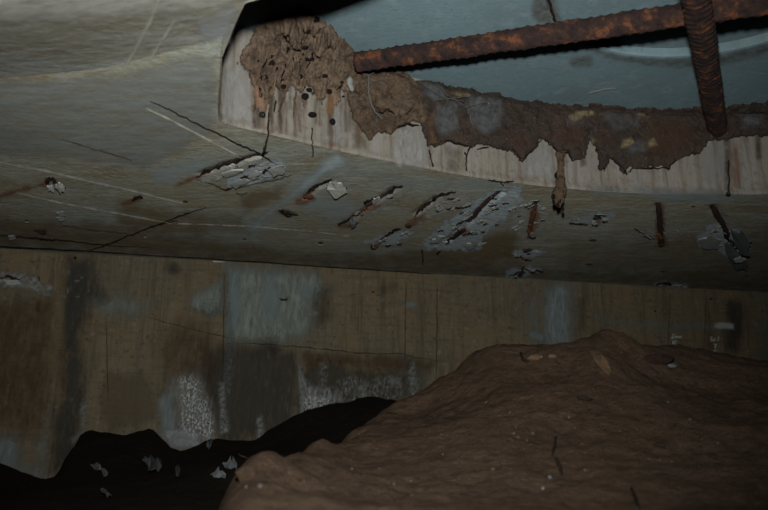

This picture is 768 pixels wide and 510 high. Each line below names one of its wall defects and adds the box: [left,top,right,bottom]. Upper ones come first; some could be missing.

spalling [285,40,319,100]
crack [150,101,292,195]
spalling [181,151,288,191]
spalling [297,176,347,203]
spalling [338,185,408,228]
spalling [363,185,554,279]
spalling [696,204,752,271]
crack [0,207,442,390]
damp [160,266,432,447]